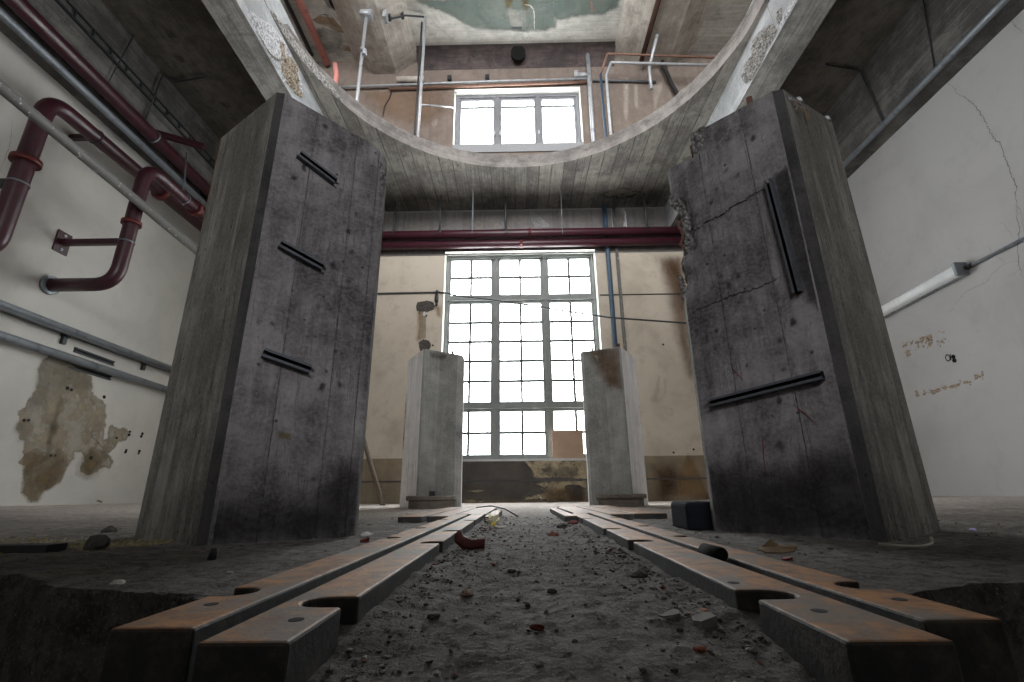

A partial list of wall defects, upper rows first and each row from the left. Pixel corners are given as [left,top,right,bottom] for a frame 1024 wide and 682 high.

spalling [247,8,345,104]
spalling [741,0,795,84]
crack [691,189,765,231]
crack [948,84,1024,312]
crack [691,276,786,313]
peeling [903,331,949,356]